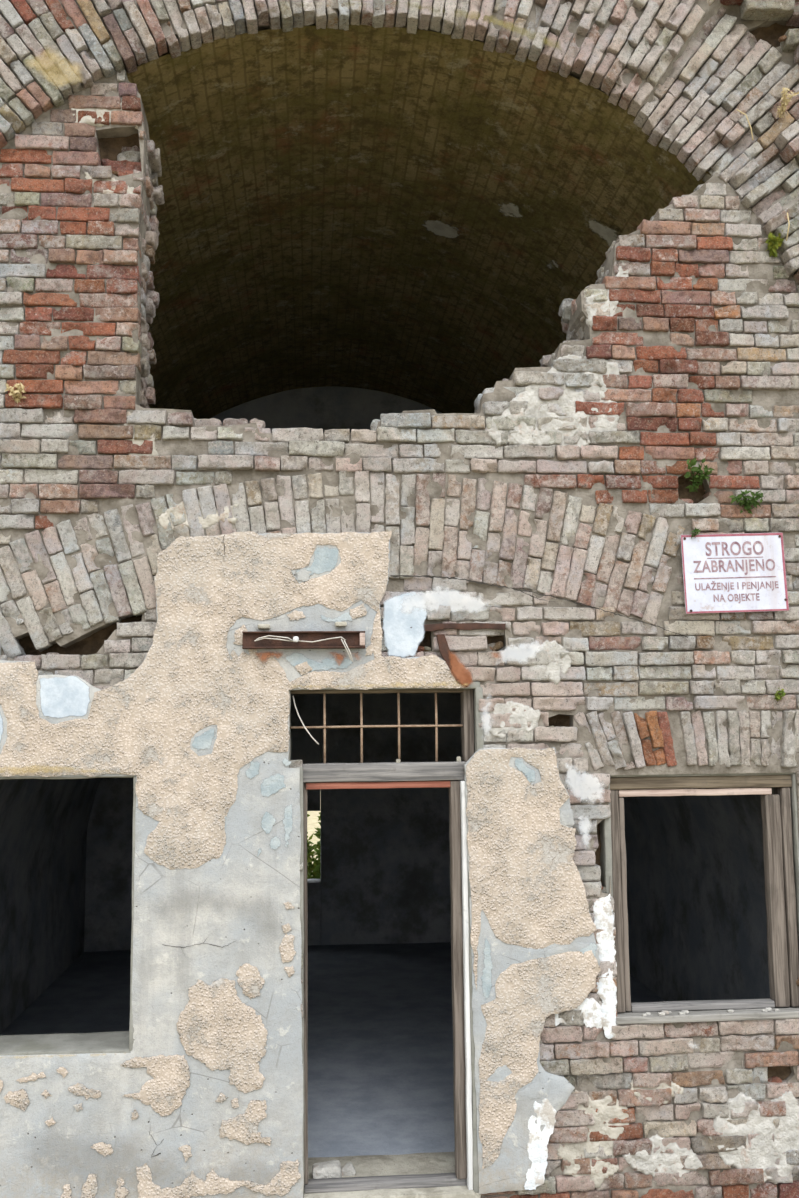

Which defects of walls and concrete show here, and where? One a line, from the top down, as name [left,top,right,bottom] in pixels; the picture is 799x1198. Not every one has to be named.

peeling [296,546,338,581]
rust [449,652,472,686]
peeling [40,676,90,718]
peeling [279,901,296,977]
peeling [524,823,617,1039]
peeling [121,963,272,1146]
peeling [0,1067,101,1112]
peeling [60,1173,98,1198]
peeling [91,1142,114,1157]
peeling [115,1144,301,1198]
spalling [524,1079,703,1190]
spalling [709,1066,799,1184]